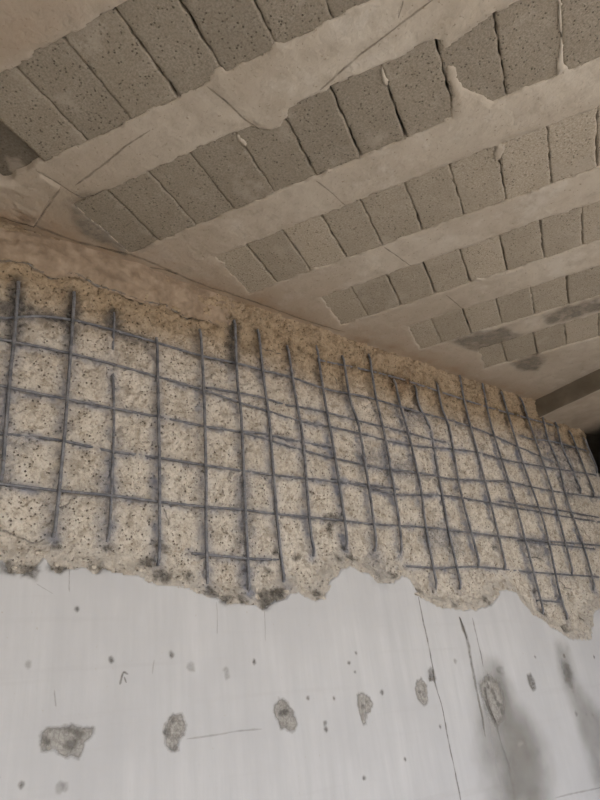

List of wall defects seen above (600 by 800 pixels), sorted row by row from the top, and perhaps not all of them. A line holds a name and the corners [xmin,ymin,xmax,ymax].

spalling [0,258,600,641]
spalling [41,725,93,757]
spalling [164,715,186,750]
spalling [274,700,297,731]
spalling [358,693,373,724]
spalling [415,678,431,705]
crack [418,597,461,800]
crack [459,617,497,732]